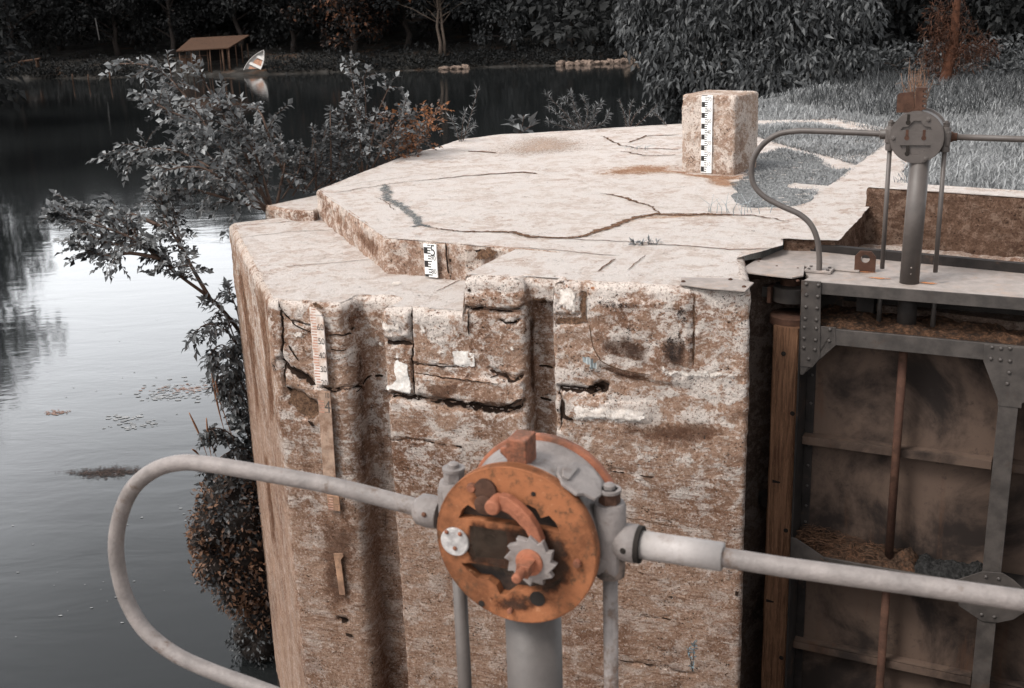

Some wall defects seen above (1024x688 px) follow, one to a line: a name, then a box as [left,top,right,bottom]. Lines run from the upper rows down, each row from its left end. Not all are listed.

crack [603,134,679,156]
crack [336,151,784,291]
crack [278,300,383,392]
leakage [603,322,643,360]
leakage [663,331,684,366]
peeling [385,355,411,394]